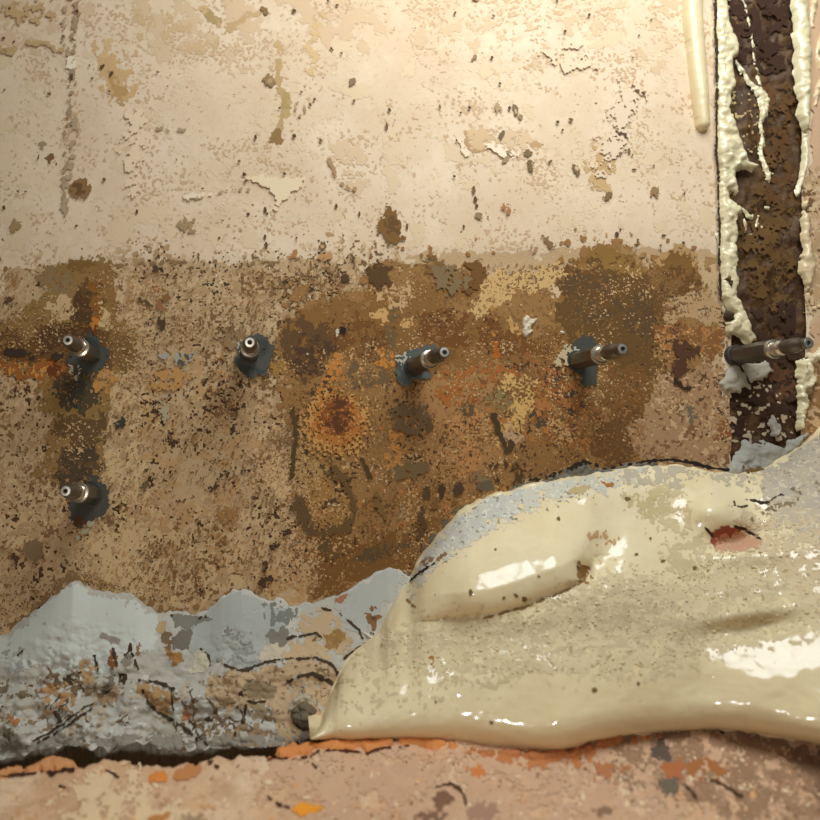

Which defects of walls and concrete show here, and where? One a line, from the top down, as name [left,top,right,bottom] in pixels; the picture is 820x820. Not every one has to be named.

corrosion [737,81,803,316]
leakage [364,259,393,290]
leakage [422,255,489,305]
corrosion [0,254,142,487]
leakage [47,372,109,494]
corrosion [273,241,732,574]
leakage [528,374,589,441]
leakage [670,338,701,390]
corrosion [801,360,820,442]
leakage [22,538,48,564]
leakage [253,444,536,600]
leakage [7,570,200,630]